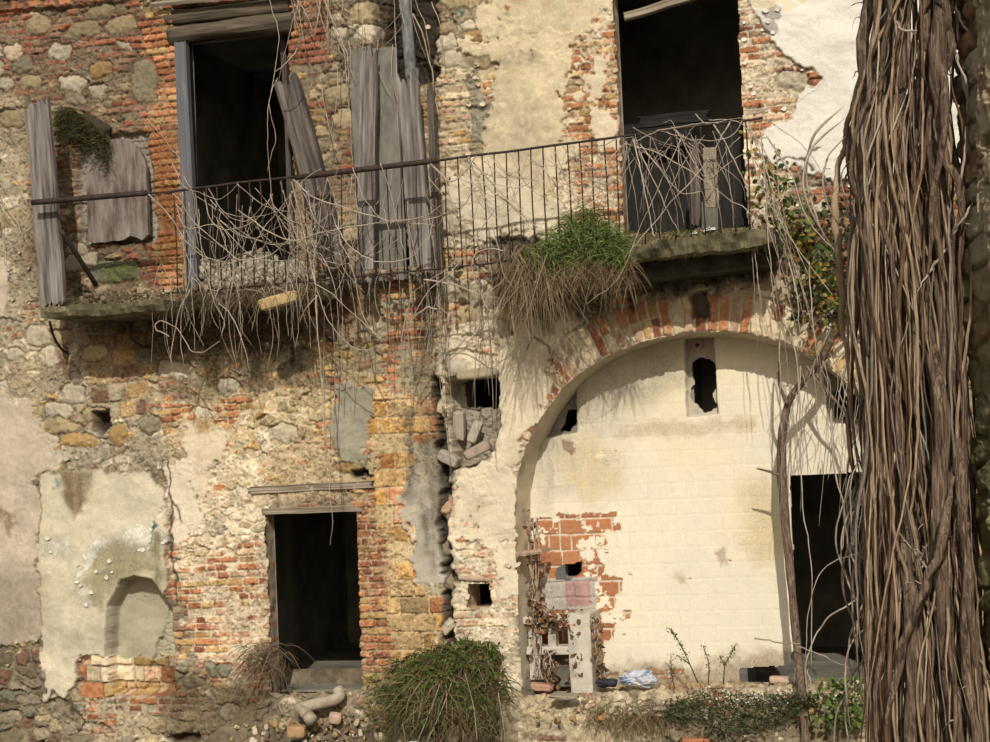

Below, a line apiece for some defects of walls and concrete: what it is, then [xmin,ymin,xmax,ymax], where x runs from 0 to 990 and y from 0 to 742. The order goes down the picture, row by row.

spalling [426,11,490,155]
spalling [563,34,623,215]
spalling [738,6,825,115]
water stain [55,471,89,513]
peeling [74,522,168,607]
crack [436,376,460,641]
peeling [538,510,632,641]
spalling [78,651,176,700]